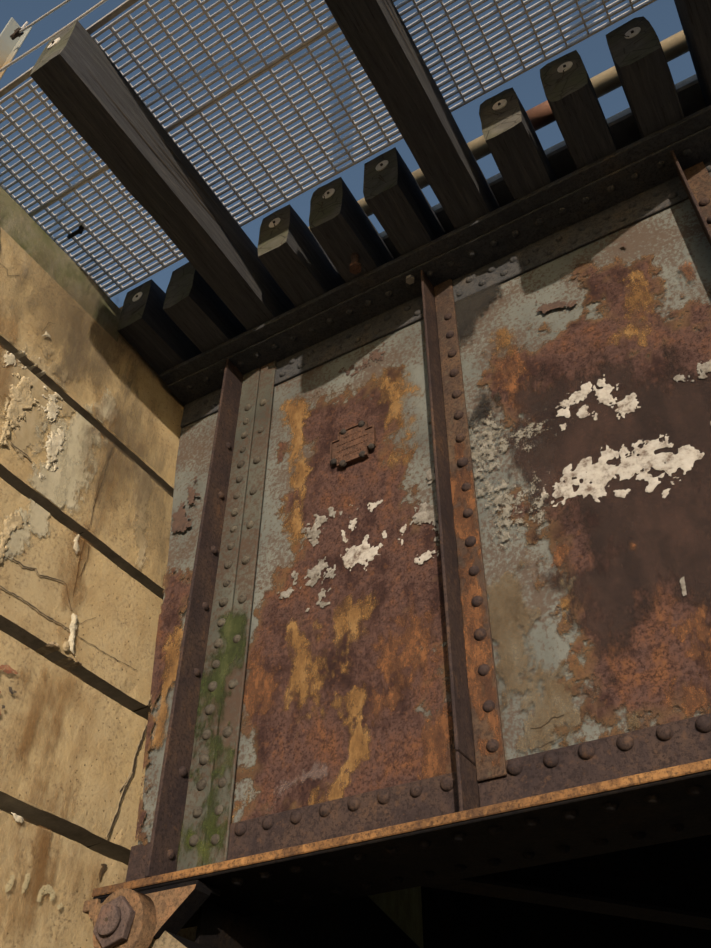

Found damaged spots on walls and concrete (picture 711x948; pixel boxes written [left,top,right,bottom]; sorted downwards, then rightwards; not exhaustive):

crack [9,441,31,461]
peeling [0,335,75,459]
crack [0,445,138,671]
crack [87,694,153,881]
corrosion [135,566,193,845]
leakage [194,611,247,745]
corrosion [230,342,456,824]
peeling [278,502,440,612]
corrosion [450,443,503,766]
peeling [469,374,704,549]
corrosion [477,254,711,748]
peeling [673,360,711,382]